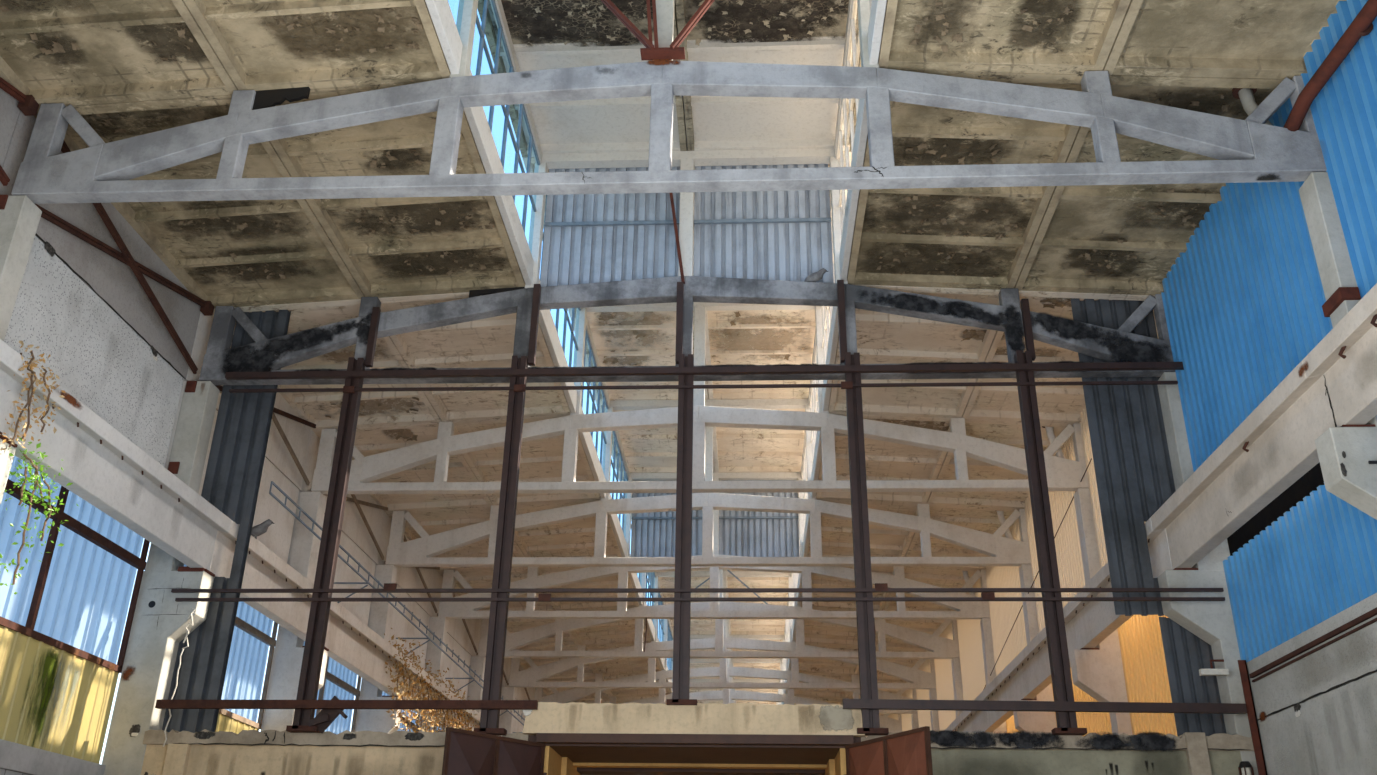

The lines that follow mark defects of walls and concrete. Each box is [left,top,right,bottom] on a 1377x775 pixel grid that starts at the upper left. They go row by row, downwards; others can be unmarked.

damp [930,730,1176,775]